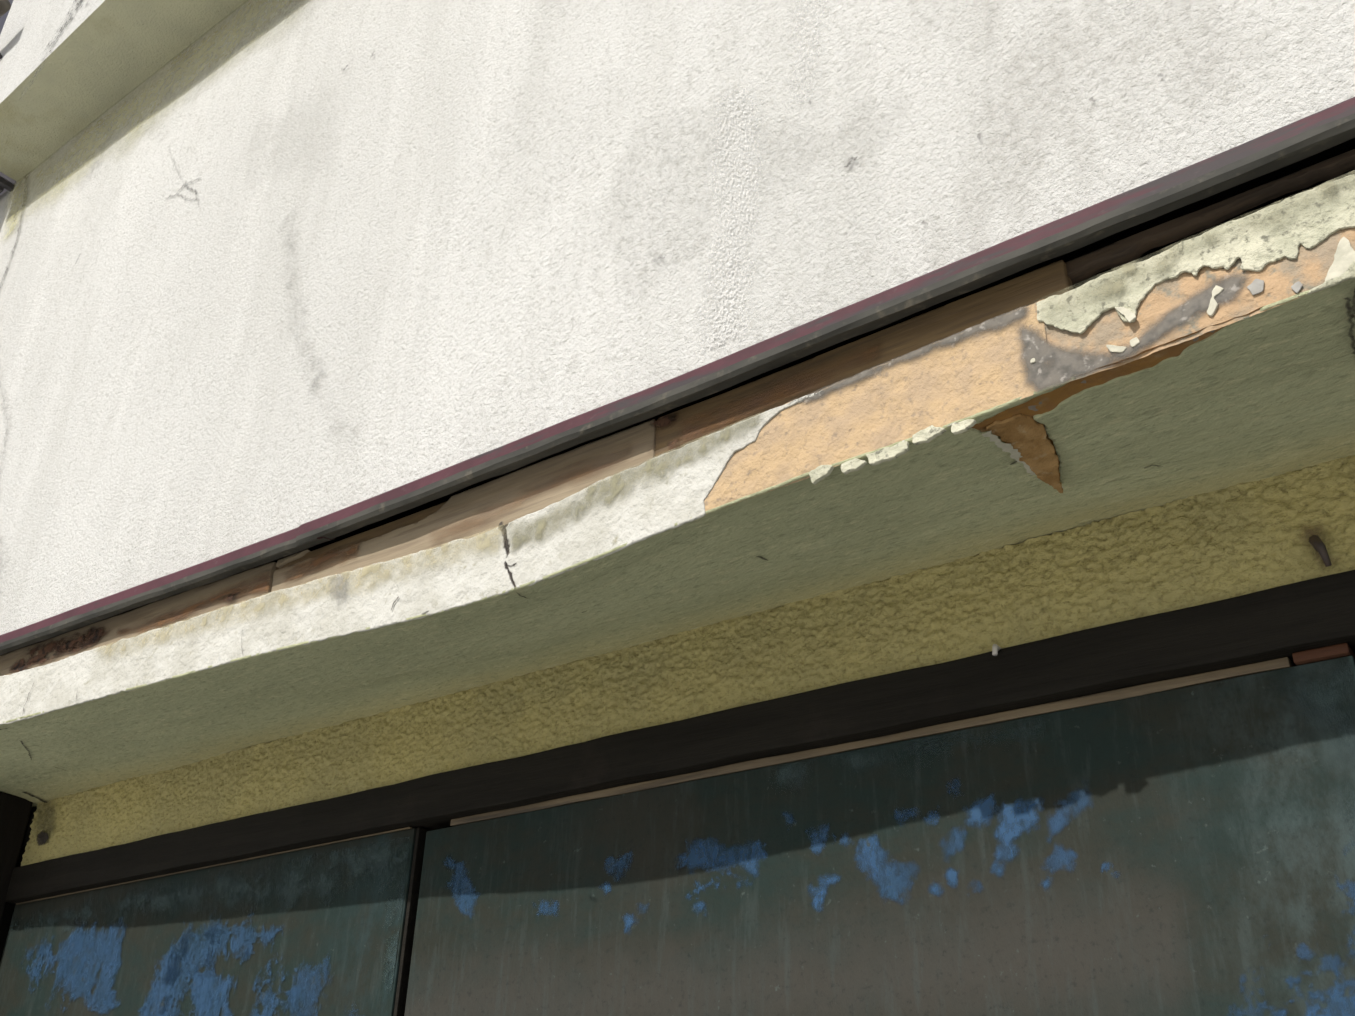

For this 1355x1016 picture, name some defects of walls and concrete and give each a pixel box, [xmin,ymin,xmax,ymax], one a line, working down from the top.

spalling [704,170,1355,511]
crack [1344,291,1355,354]
crack [498,521,526,598]